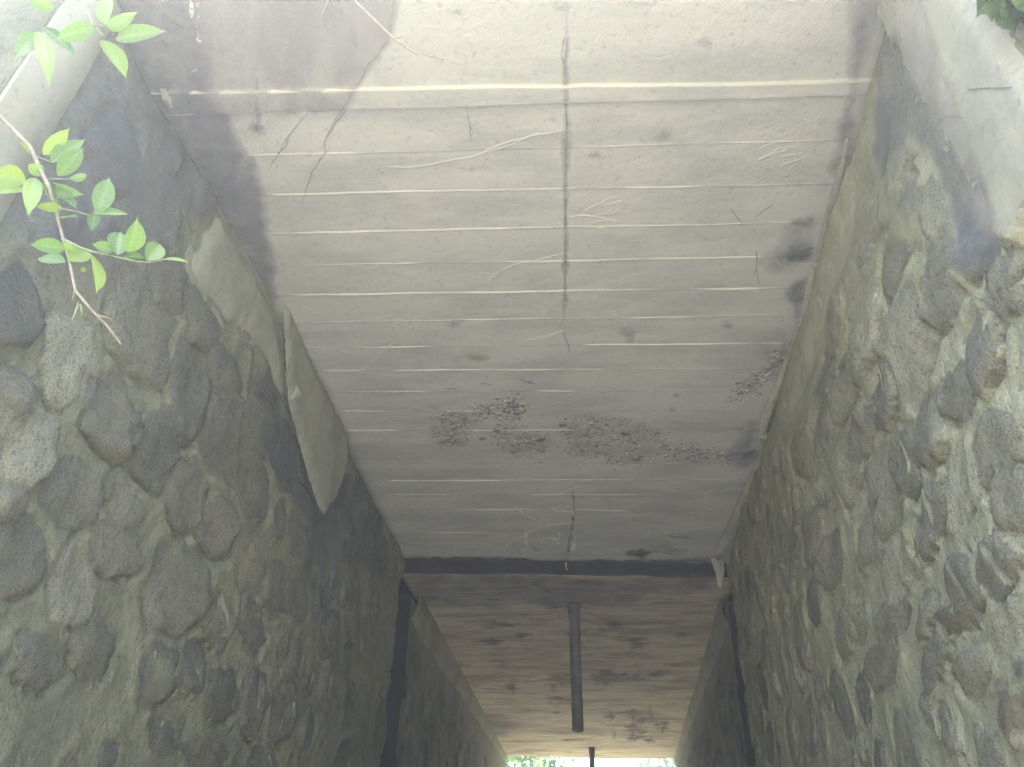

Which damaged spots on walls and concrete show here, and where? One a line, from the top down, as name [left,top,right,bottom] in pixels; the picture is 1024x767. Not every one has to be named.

leakage [331,0,394,73]
leakage [45,0,261,251]
crack [269,114,307,170]
crack [303,17,393,199]
spalling [432,398,551,452]